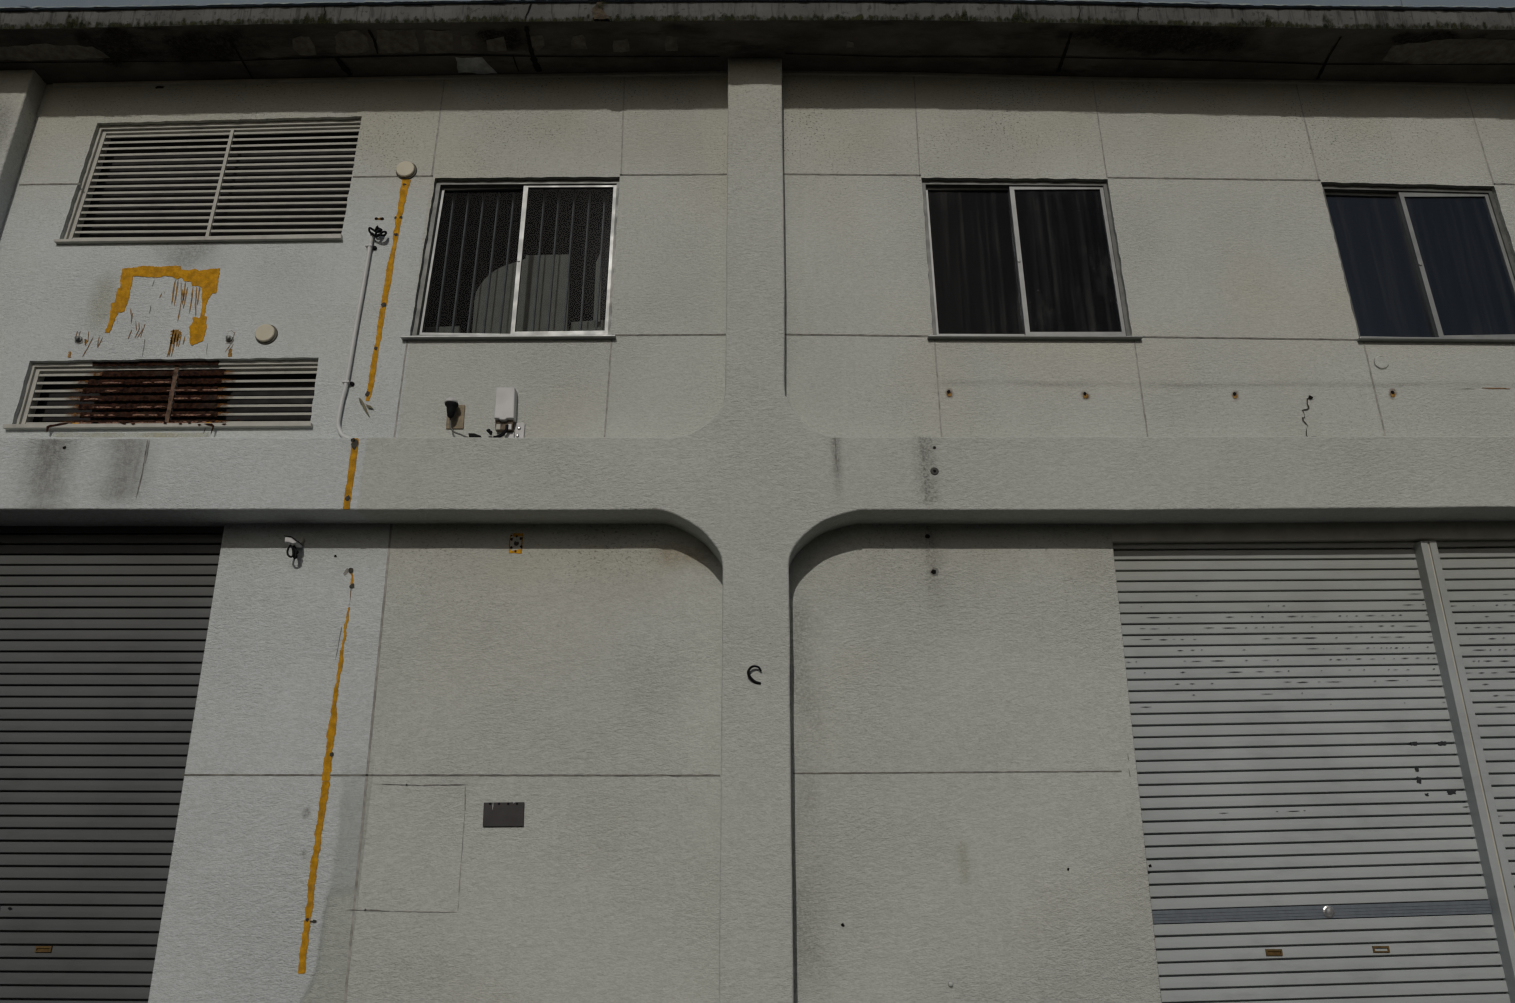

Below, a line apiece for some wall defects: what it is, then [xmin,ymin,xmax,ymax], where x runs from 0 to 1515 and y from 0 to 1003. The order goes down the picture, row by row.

rust [46,360,240,434]
crack [1302,395,1317,437]